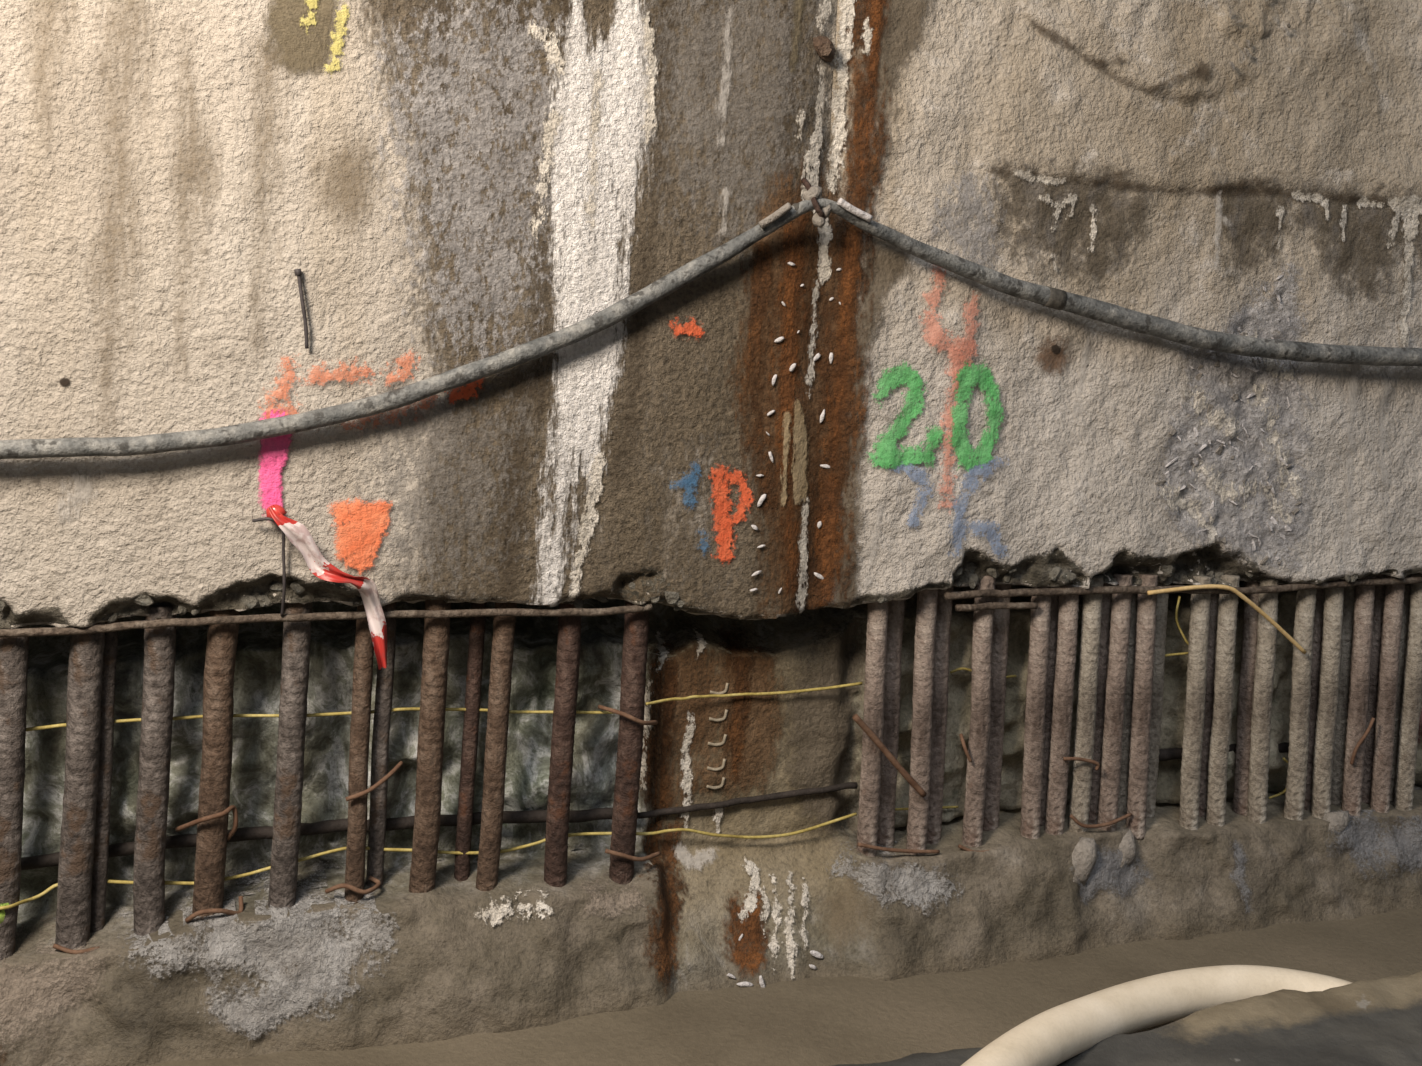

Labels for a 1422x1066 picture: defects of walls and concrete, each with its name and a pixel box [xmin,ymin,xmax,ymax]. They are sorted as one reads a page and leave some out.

damp [264,0,337,74]
rust [730,0,891,619]
damp [987,158,1154,290]
peeling [1221,262,1308,341]
damp [1211,172,1422,347]
damp [358,0,965,917]
peeling [0,346,1422,961]
rust [639,624,783,990]
damp [727,856,824,988]